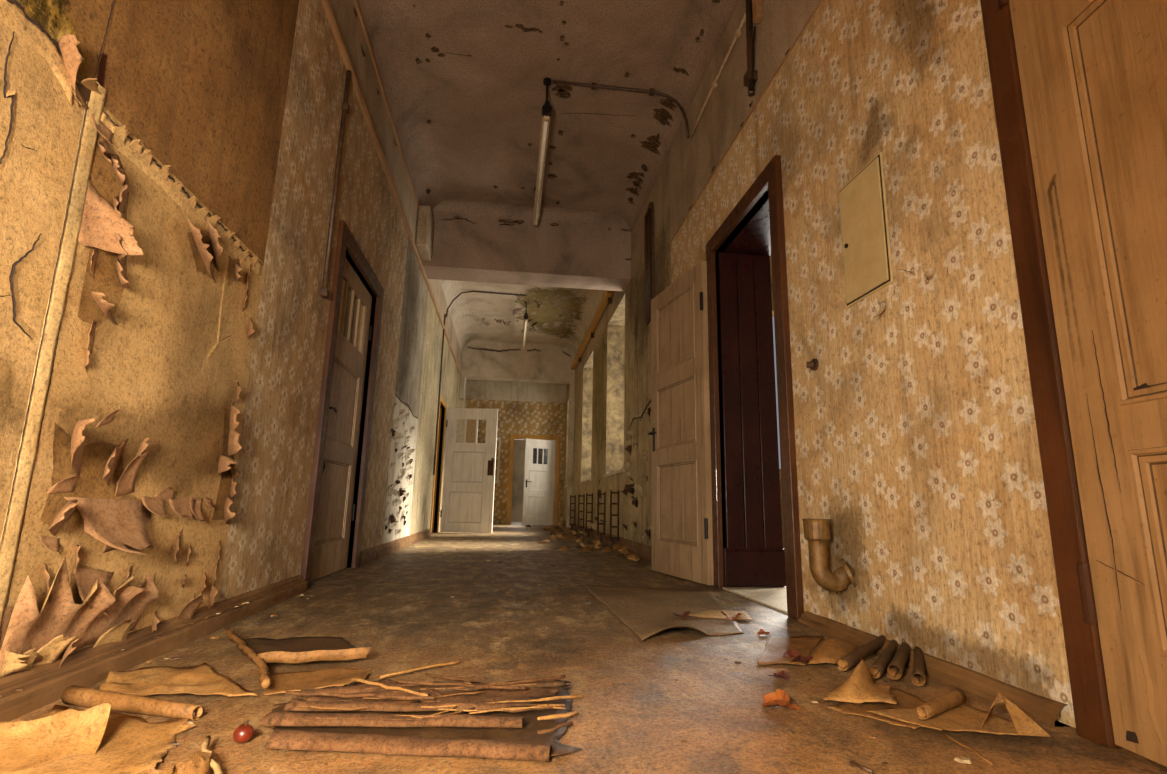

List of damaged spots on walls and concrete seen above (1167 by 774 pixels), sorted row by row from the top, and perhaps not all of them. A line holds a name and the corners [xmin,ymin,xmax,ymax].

damp [16,0,86,86]
crack [0,31,38,170]
peeling [630,99,677,155]
peeling [626,164,649,205]
crack [0,233,46,340]
peeling [385,403,415,535]
peeling [0,382,242,677]